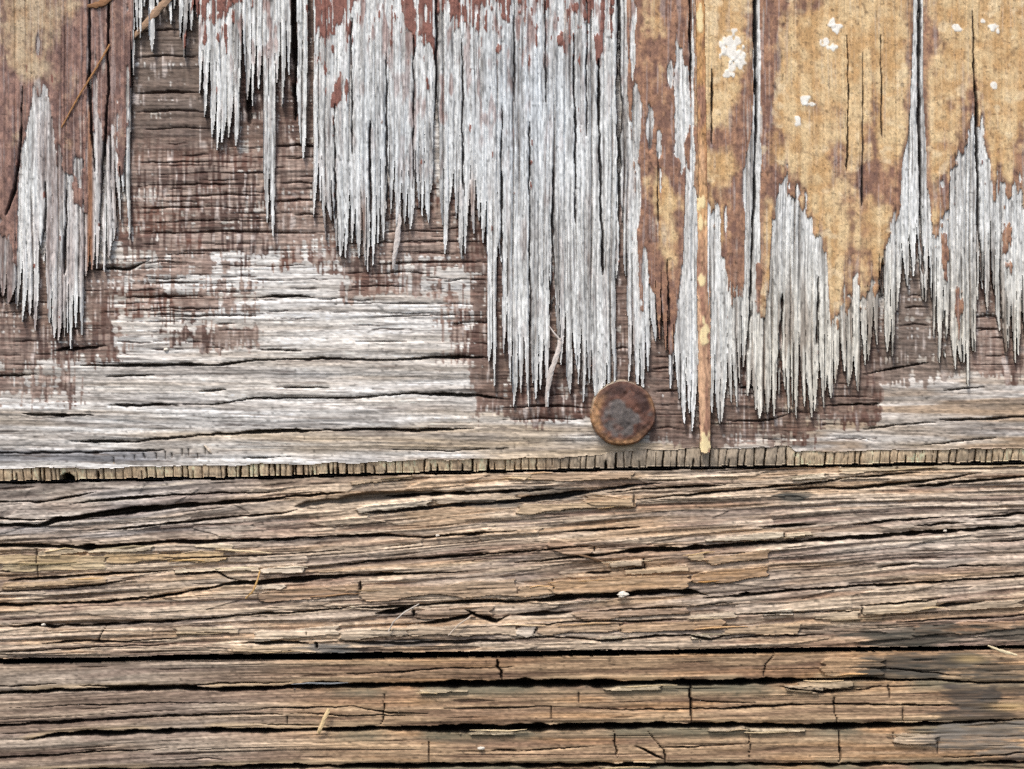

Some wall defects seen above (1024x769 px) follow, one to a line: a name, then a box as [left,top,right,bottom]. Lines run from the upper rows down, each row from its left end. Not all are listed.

peeling [196,0,239,55]
peeling [315,0,357,48]
peeling [401,0,512,56]
peeling [331,72,349,110]
peeling [0,0,135,266]
peeling [557,0,1024,356]
crack [261,292,313,300]
crack [56,346,486,367]
crack [23,392,509,443]
rust [590,393,641,445]
crack [912,476,1024,487]
crack [0,478,1024,769]